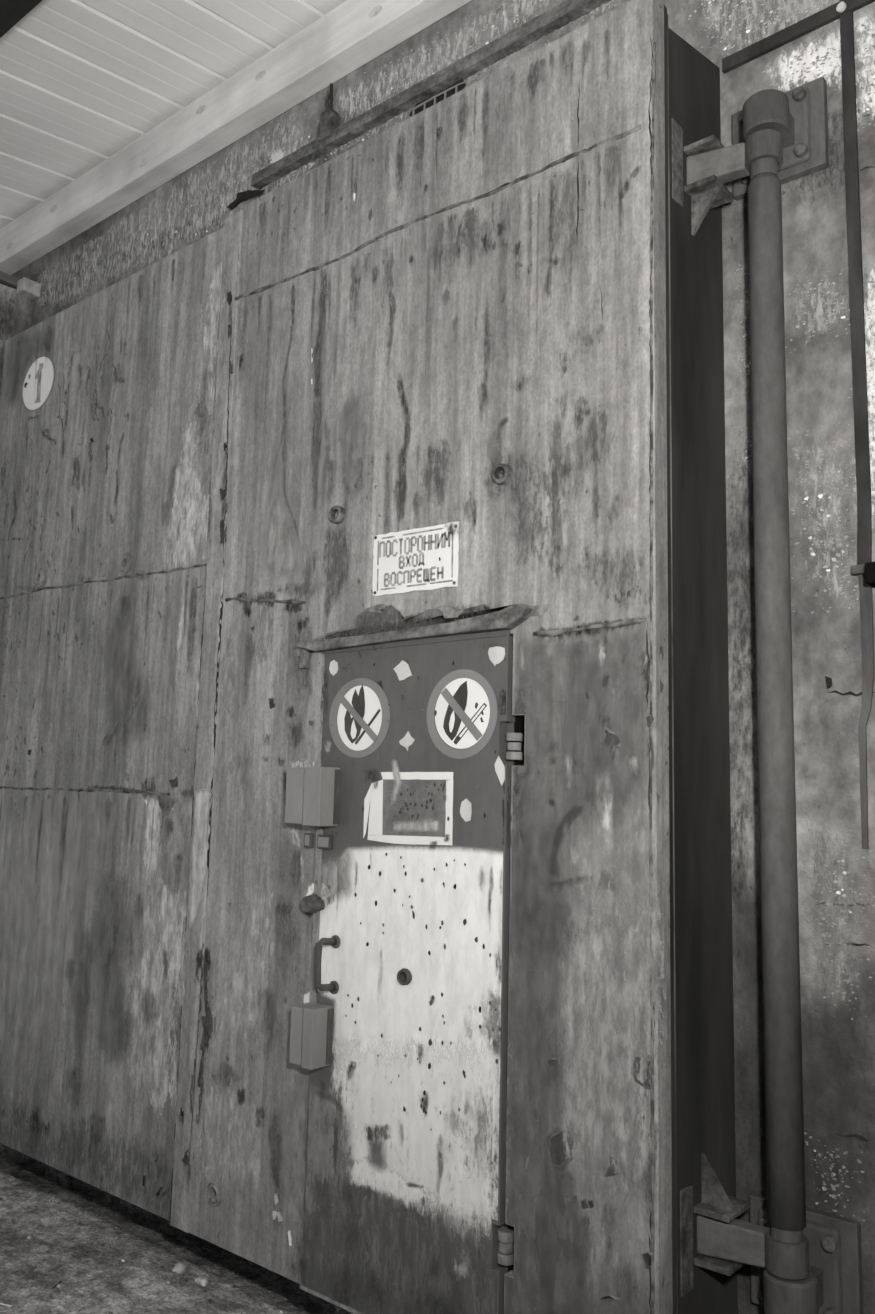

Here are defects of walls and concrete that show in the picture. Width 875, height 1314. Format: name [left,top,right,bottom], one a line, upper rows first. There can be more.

corrosion [396,380,447,517]
corrosion [487,401,607,575]
corrosion [593,551,642,604]
damp [69,876,127,1058]
corrosion [180,948,215,1123]
peeling [548,787,664,1269]
corrosion [182,1147,194,1187]